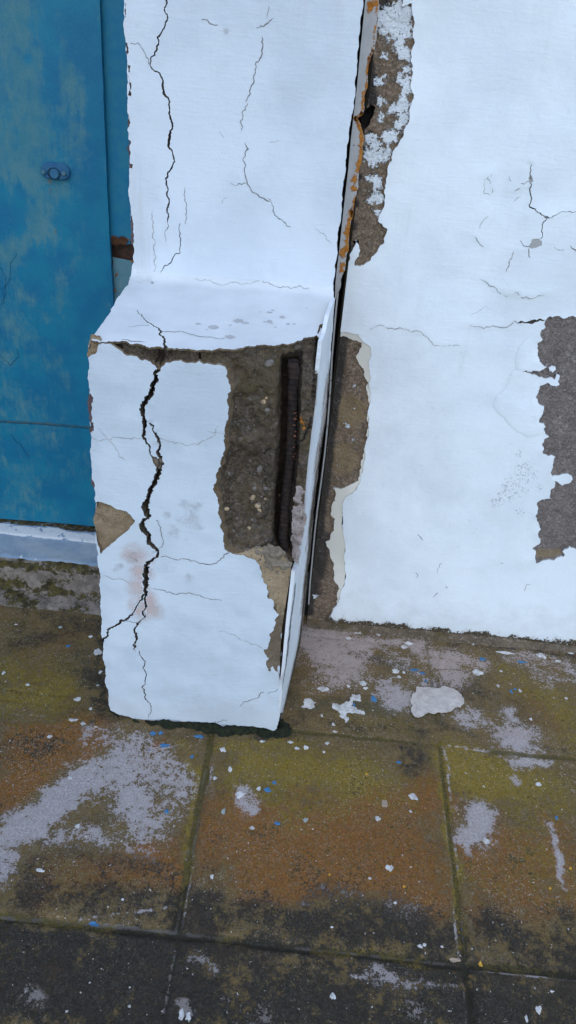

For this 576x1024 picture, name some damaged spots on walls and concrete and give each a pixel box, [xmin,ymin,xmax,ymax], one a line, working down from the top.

crack [131,0,187,272]
crack [221,9,290,227]
corrosion [339,0,379,273]
peeling [349,0,415,265]
crack [372,164,576,346]
peeling [93,502,135,551]
crack [93,311,229,714]
spalling [120,319,371,674]
peeling [526,316,576,562]